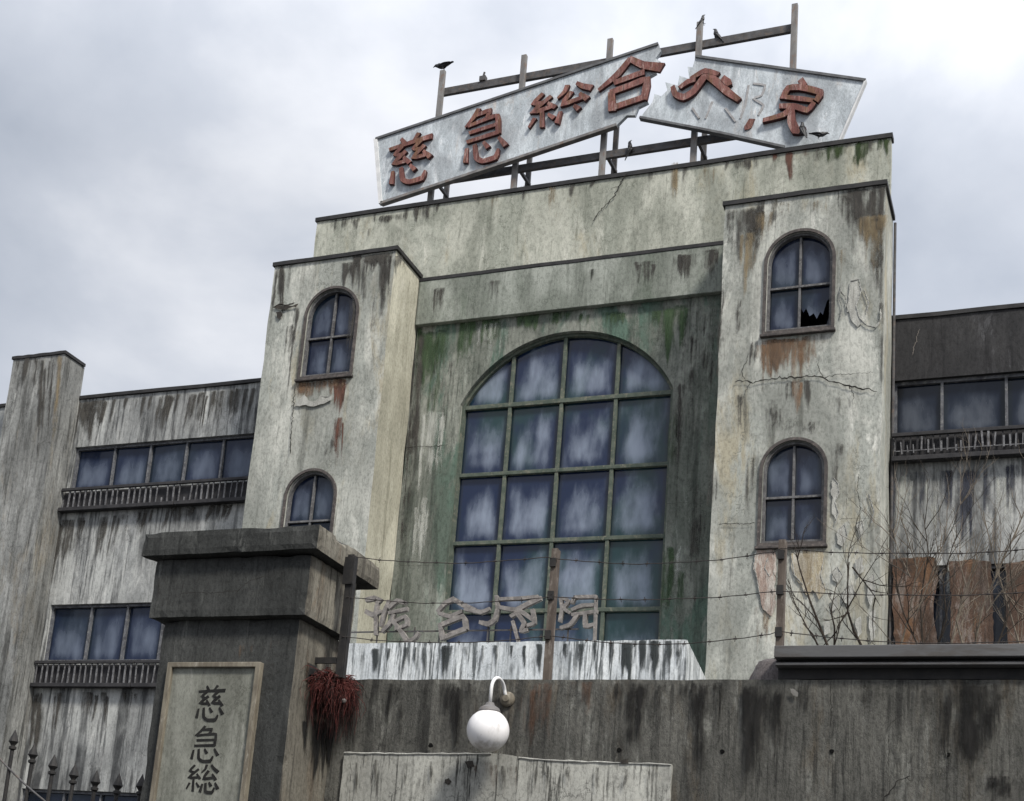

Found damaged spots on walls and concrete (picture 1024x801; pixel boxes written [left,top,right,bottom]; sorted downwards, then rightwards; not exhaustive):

crack [593,173,628,221]
leakage [842,185,886,290]
peeling [838,279,882,328]
leakage [16,358,53,451]
leakage [75,398,128,438]
leakage [140,388,255,425]
corrosion [299,379,347,450]
leakage [404,336,447,502]
corrosion [758,337,814,408]
crack [735,343,877,404]
spalling [753,550,777,616]
leakage [29,693,62,747]